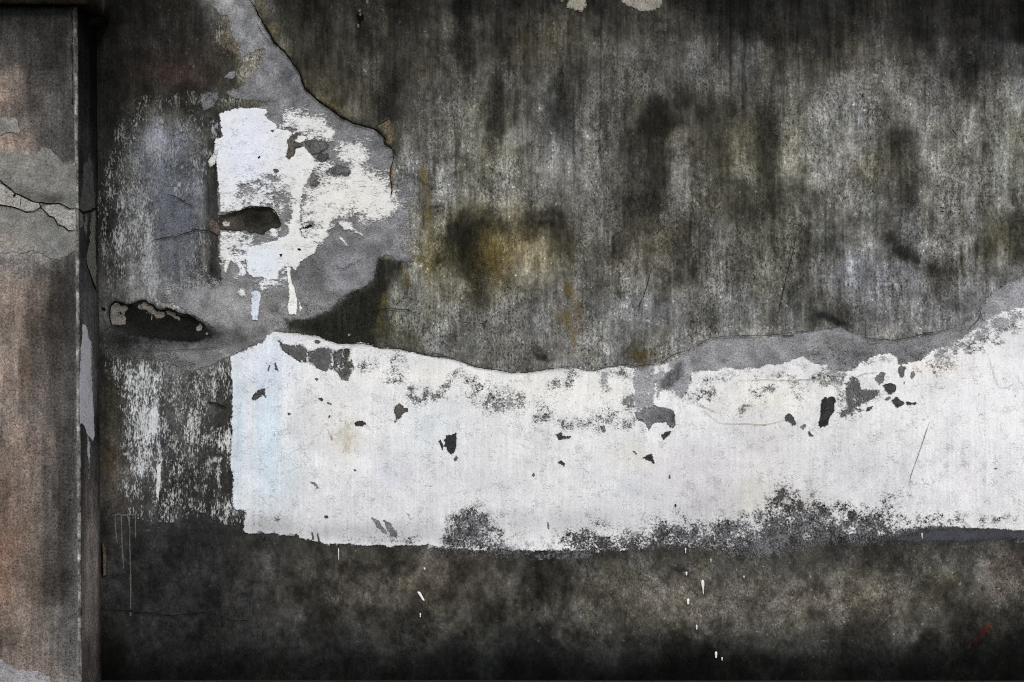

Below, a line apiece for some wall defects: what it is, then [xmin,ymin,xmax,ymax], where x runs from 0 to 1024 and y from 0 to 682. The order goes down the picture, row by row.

crack [250,0,394,198]
crack [0,180,96,231]
peeling [80,0,1024,553]
leakage [886,233,936,270]
leakage [114,513,137,569]